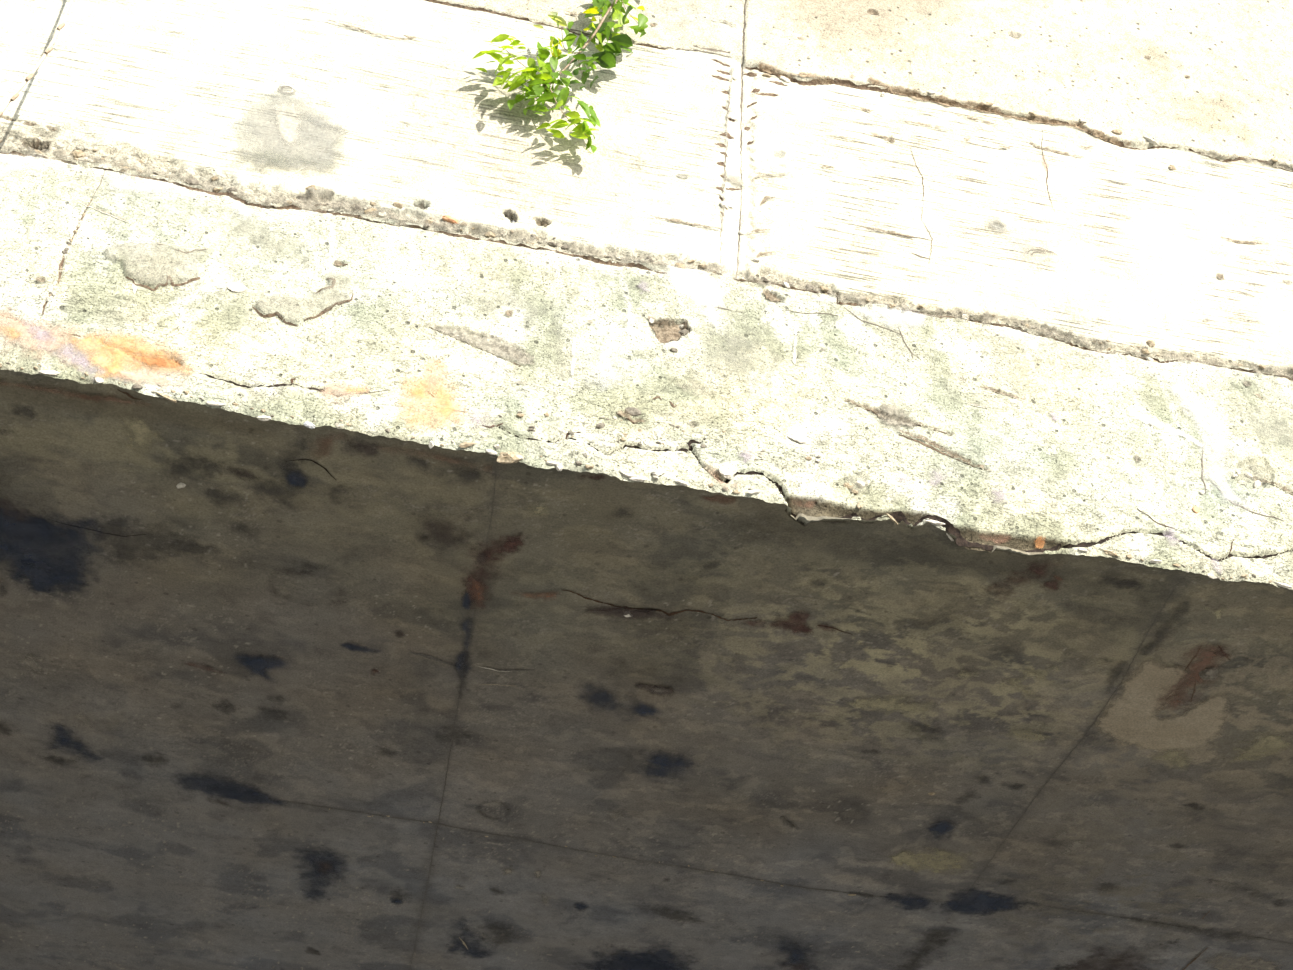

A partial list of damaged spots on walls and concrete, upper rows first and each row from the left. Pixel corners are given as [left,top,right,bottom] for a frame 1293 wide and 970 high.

water stain [242,91,342,169]
corrosion [6,327,187,404]
spalling [648,316,690,352]
crack [483,423,799,521]
crack [837,453,1293,562]
water stain [0,502,146,591]
corrosion [463,535,523,609]
crack [563,590,757,621]
water stain [181,775,282,805]
water stain [587,949,689,970]